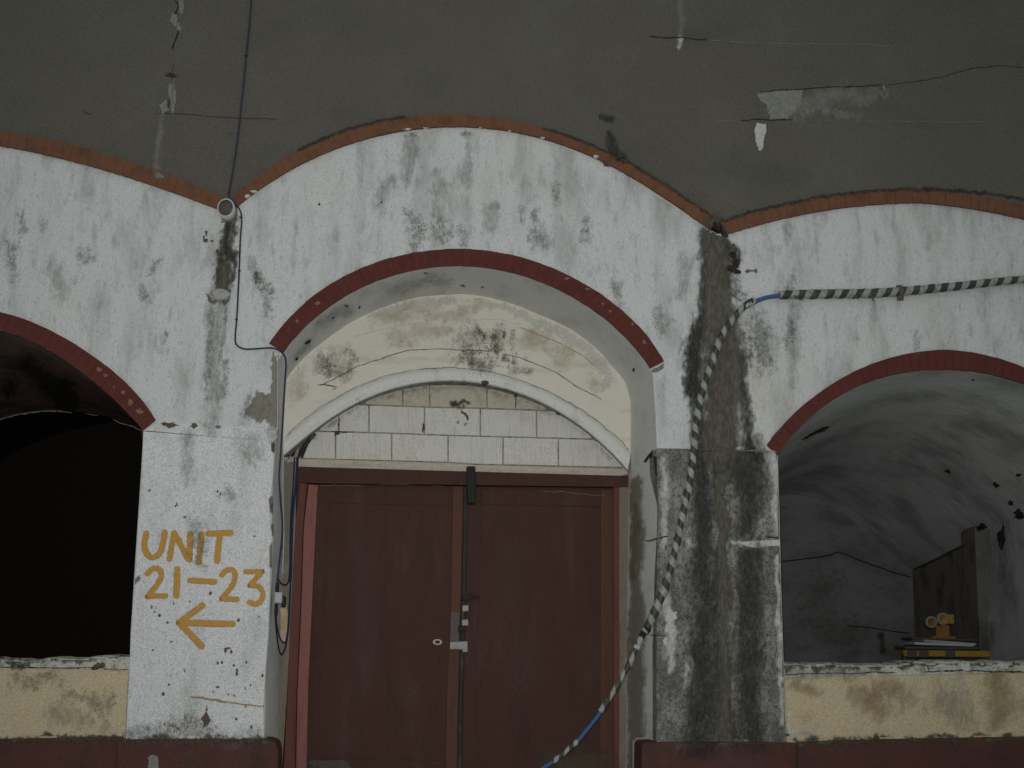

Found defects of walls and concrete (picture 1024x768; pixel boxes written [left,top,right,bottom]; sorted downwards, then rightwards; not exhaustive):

spalling [159,73,178,115]
crack [157,0,278,120]
crack [649,36,816,44]
peeling [754,90,803,151]
crack [726,116,843,124]
crack [758,65,1024,93]
water stain [206,216,238,305]
crack [285,348,629,451]
water stain [543,115,1024,768]